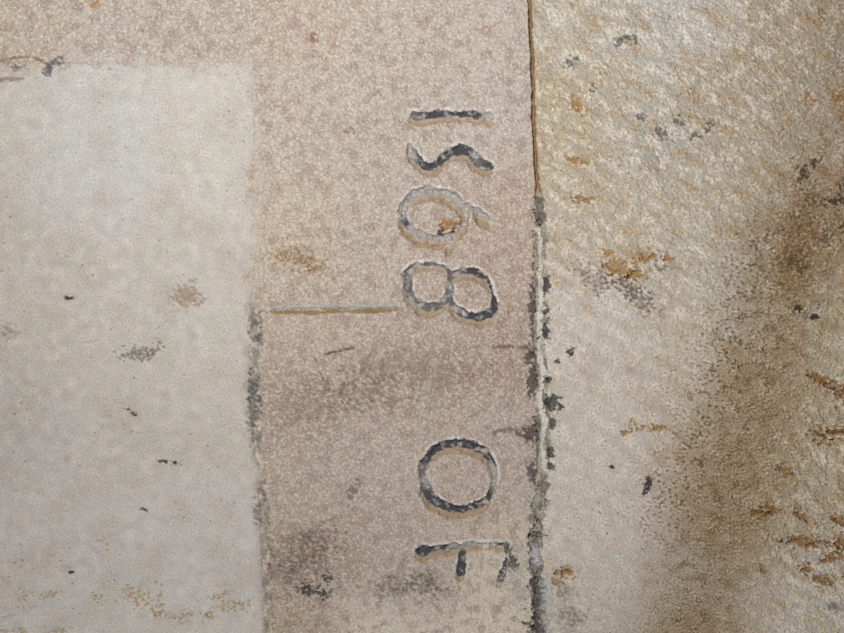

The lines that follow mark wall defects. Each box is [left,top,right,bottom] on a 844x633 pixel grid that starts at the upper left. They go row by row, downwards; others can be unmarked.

leakage [571,262,652,312]